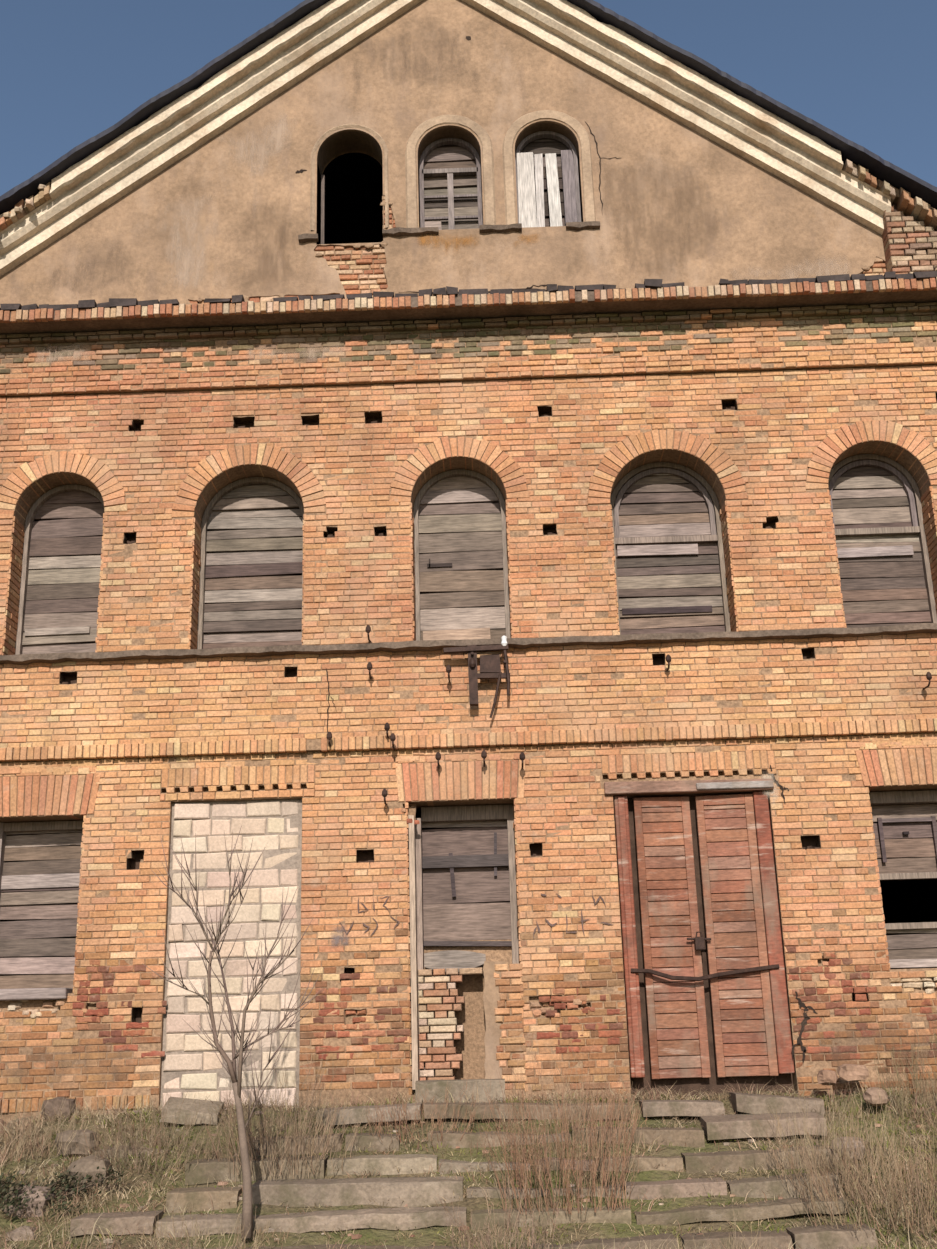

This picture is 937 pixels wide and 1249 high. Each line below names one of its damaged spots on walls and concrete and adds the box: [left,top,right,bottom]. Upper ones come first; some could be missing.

crack [586,123,619,215]
spalling [314,196,396,297]
spalling [231,293,314,302]